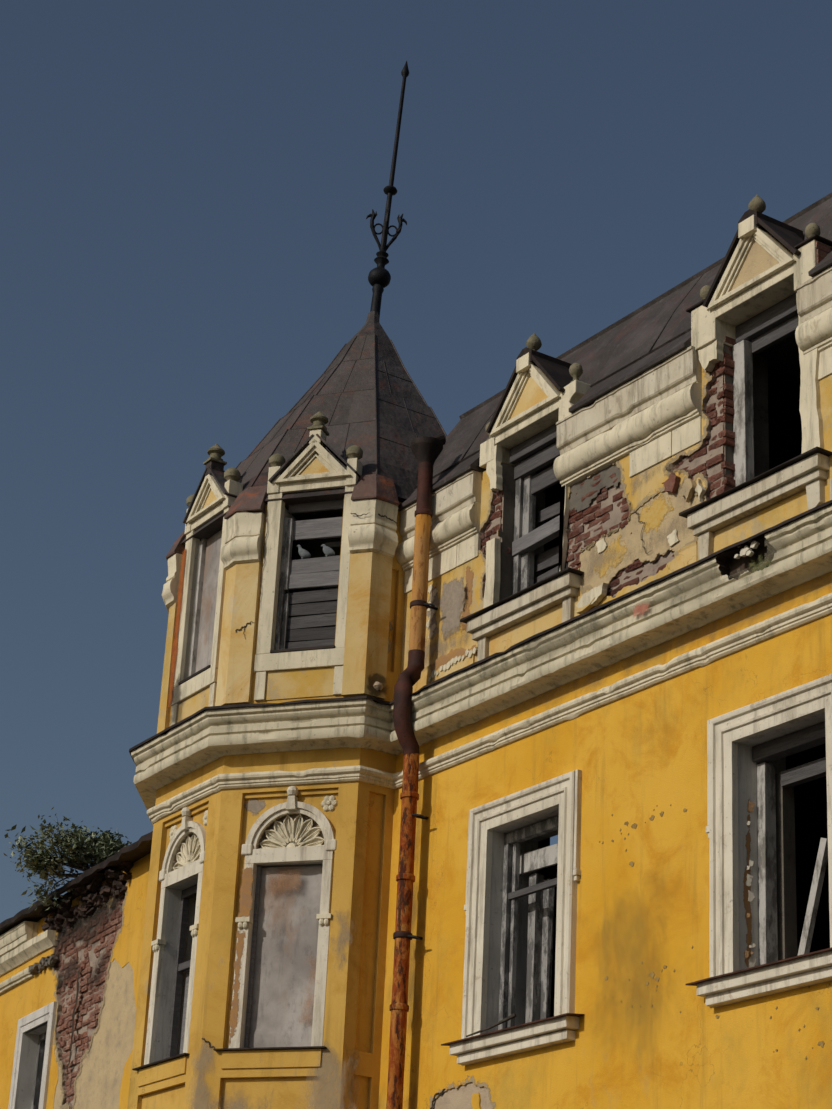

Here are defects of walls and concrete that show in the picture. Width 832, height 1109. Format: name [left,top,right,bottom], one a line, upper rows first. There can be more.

flaking render [816,241,831,264]
crack [235,517,268,637]
peeling [426,483,511,681]
peeling [565,336,736,614]
peeling [734,541,760,559]
peeling [743,799,756,968]
flaking render [51,879,136,1109]
peeling [429,1075,496,1109]